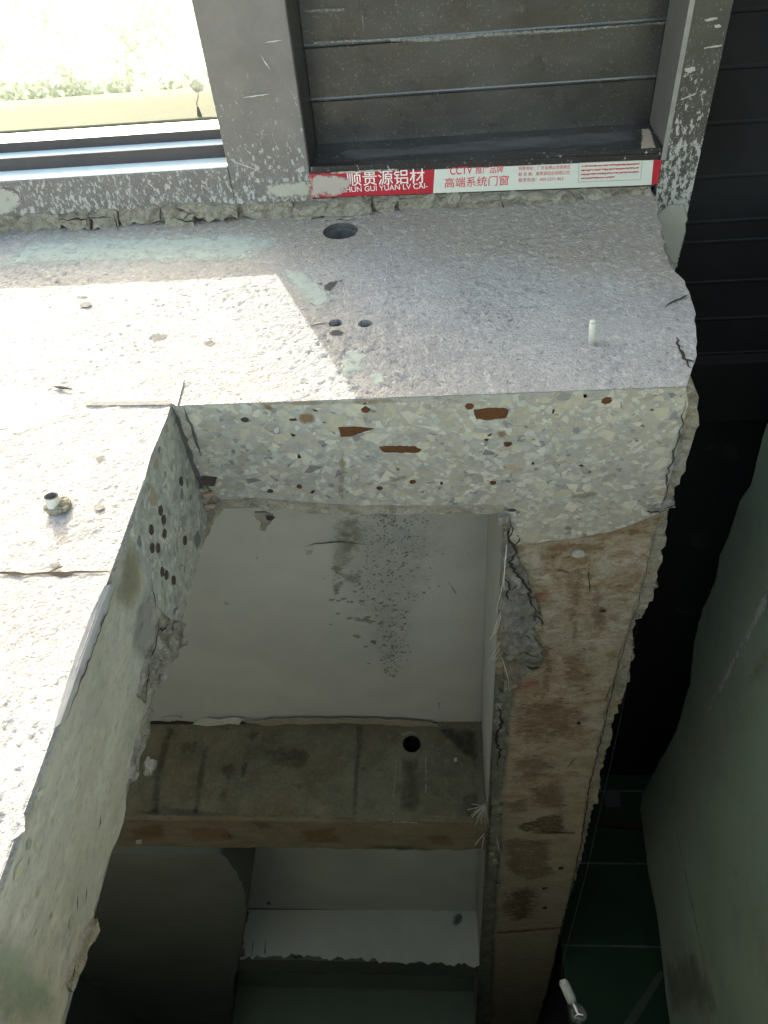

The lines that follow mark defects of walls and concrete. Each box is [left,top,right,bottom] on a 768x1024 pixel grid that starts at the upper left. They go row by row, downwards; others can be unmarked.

leakage [323,514,483,677]
spalling [128,387,687,1024]
crack [494,700,505,771]
spalling [65,919,100,992]